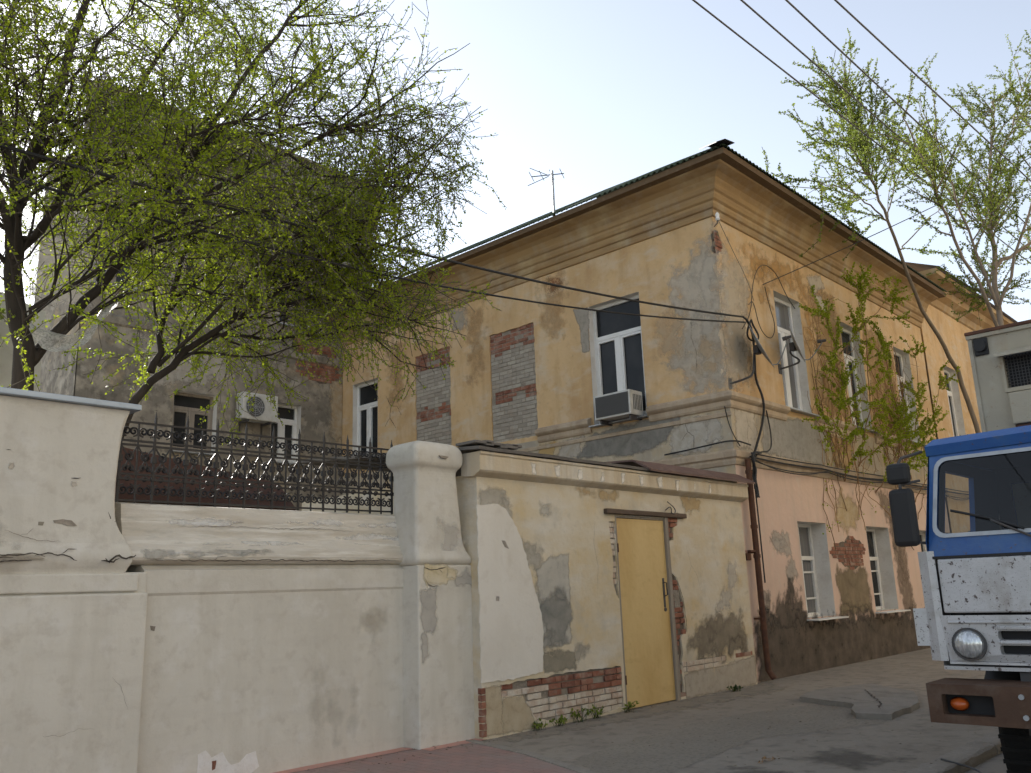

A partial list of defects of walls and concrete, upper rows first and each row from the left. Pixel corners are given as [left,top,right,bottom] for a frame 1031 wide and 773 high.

flaking render [293,338,343,441]
crack [7,530,394,563]
flaking render [830,488,872,616]
peeling [421,504,623,738]
flaking render [672,576,753,697]
peeling [197,750,259,773]